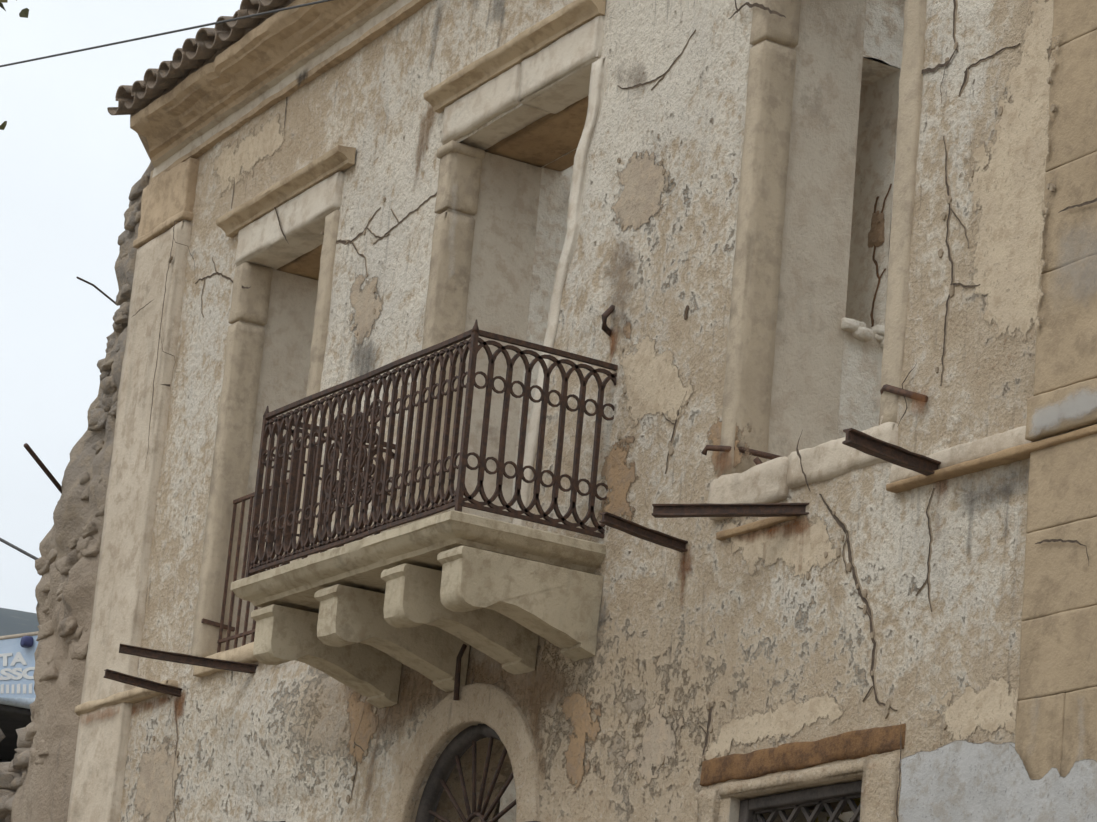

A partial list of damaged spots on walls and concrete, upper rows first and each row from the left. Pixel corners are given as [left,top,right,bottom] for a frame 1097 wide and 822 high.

crack [618,29,696,91]
crack [921,0,1021,97]
crack [132,221,250,468]
spalling [347,274,383,346]
crack [321,192,437,277]
spalling [611,145,673,232]
crack [870,245,886,327]
crack [898,135,980,425]
peeling [959,0,1060,341]
crack [916,488,935,612]
crack [796,433,902,822]
spalling [560,684,601,793]